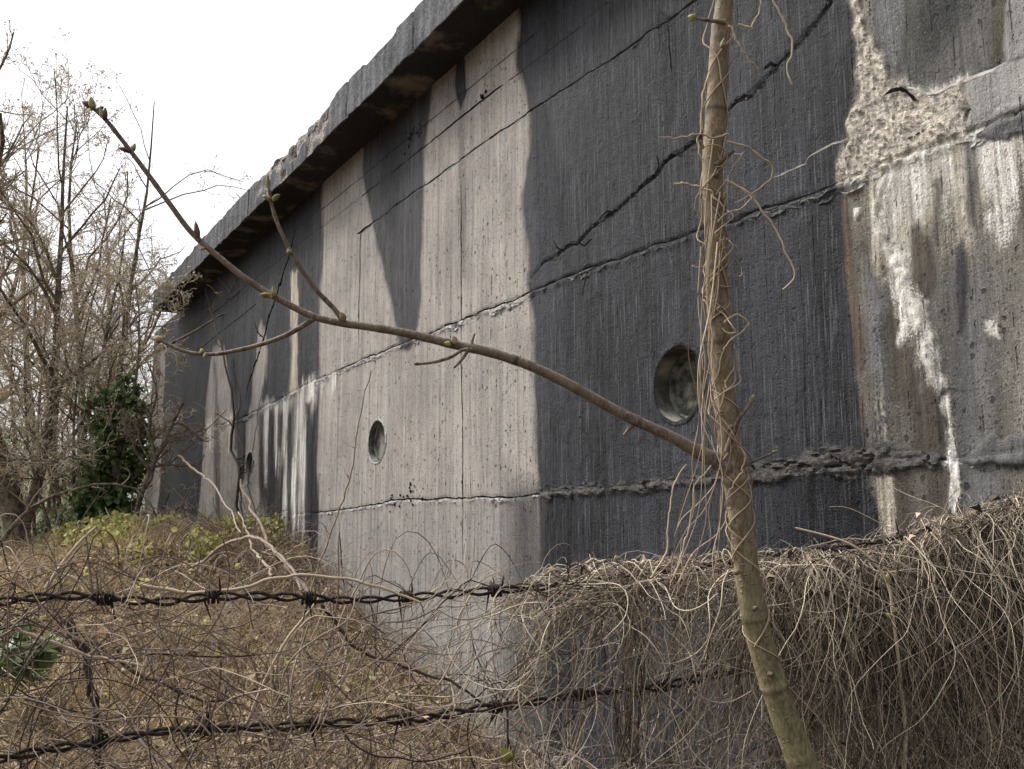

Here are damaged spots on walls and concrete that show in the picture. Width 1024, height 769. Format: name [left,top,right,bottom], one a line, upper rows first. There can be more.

crack [534,135,703,275]
crack [665,18,673,72]
crack [726,0,833,115]
crack [773,137,850,178]
damp [723,0,1024,563]
spalling [836,0,1024,185]
damp [157,185,336,566]
damp [509,0,788,769]